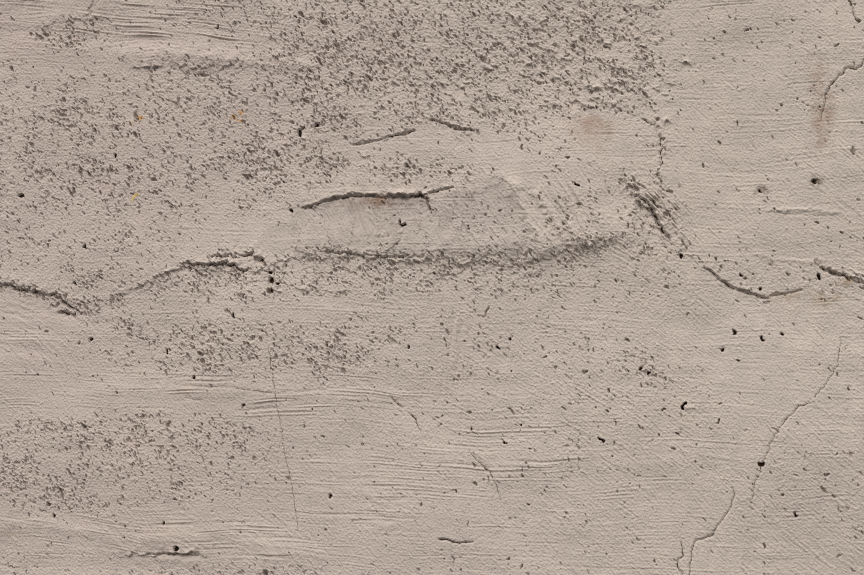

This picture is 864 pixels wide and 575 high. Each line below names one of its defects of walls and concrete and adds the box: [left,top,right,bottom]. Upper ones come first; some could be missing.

crack [637,116,672,239]
crack [305,190,439,209]
crack [0,279,83,315]
crack [188,254,265,276]
crack [707,267,801,299]
crack [822,267,864,285]